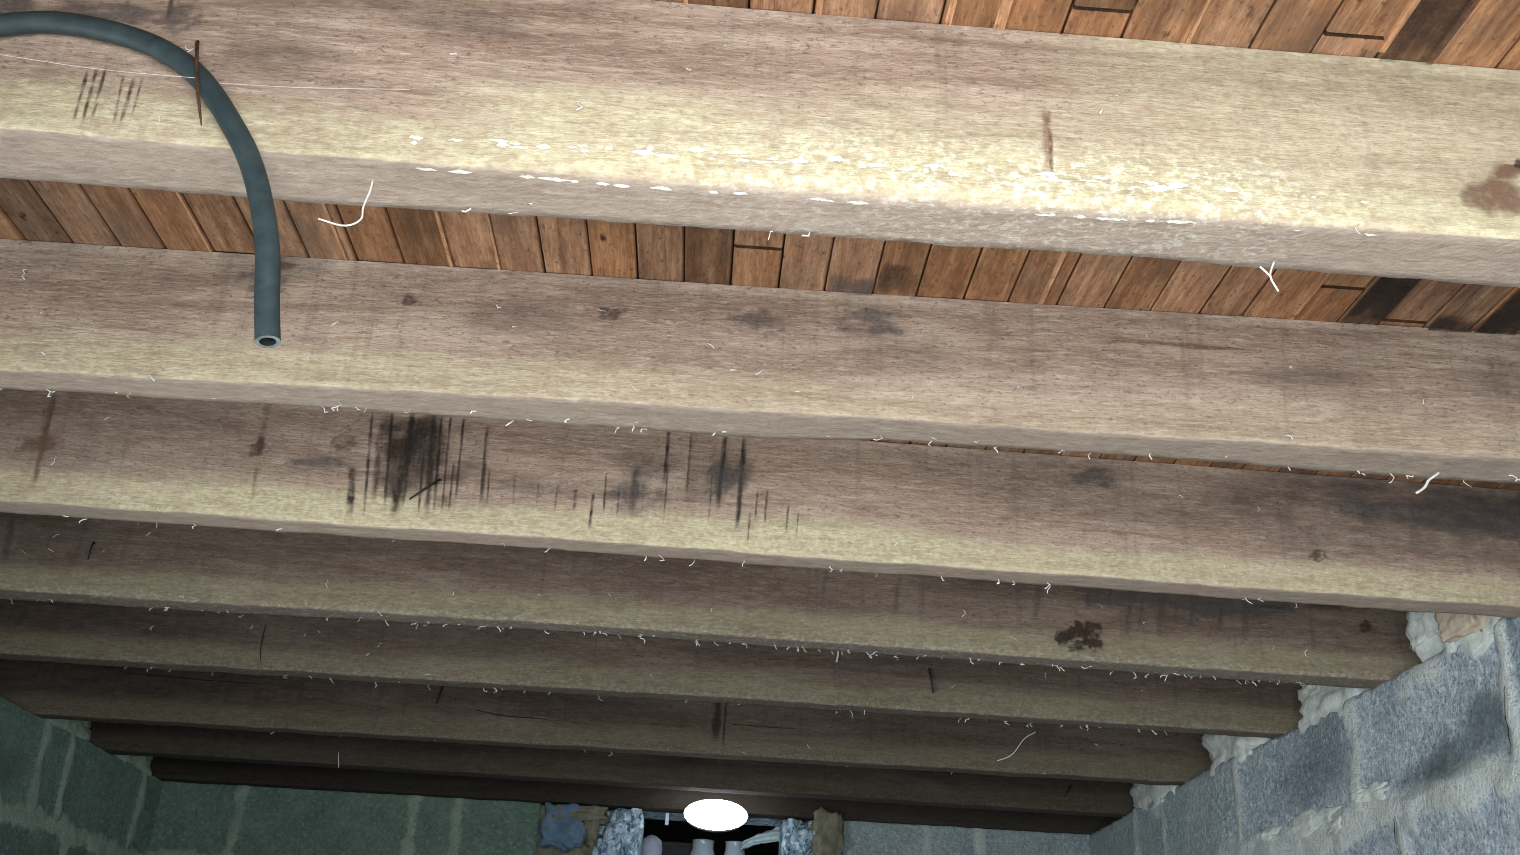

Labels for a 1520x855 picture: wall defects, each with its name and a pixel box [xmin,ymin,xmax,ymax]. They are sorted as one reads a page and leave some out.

water stain [295,416,464,511]
water stain [481,434,490,494]
water stain [710,437,767,528]
water stain [1055,621,1102,651]